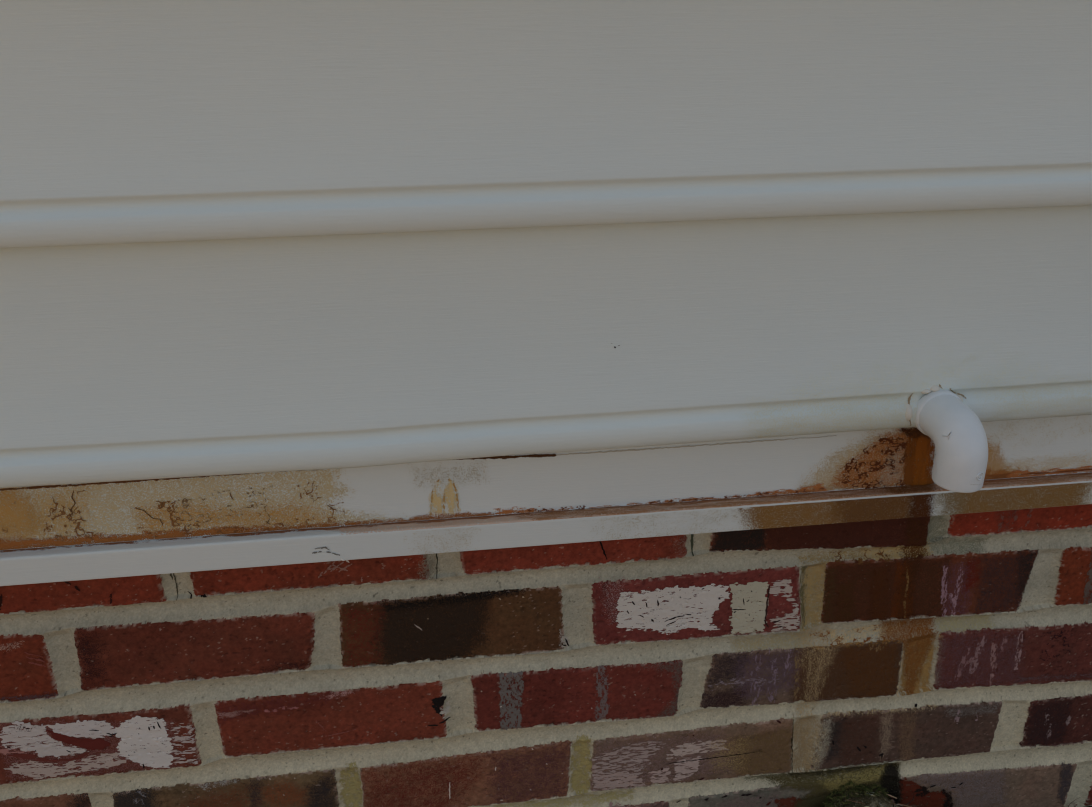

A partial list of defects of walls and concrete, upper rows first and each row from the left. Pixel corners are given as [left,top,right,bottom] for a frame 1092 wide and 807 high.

damp [0,468,421,545]
rust [0,420,1092,696]